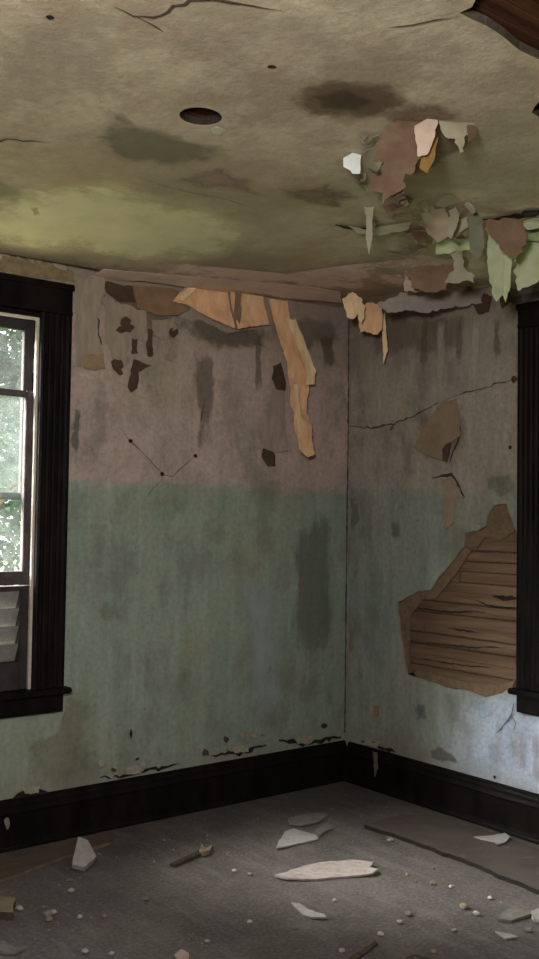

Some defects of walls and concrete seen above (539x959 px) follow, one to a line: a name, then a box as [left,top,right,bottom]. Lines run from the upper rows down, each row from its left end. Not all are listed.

crack [115,0,282,32]
crack [0,136,51,144]
water stain [108,118,210,161]
water stain [304,82,466,173]
peeling [487,218,539,304]
peeling [101,316,142,370]
peeling [269,298,316,457]
crack [344,318,511,733]
flaking render [398,504,517,697]
flaking render [98,747,180,779]
flaking render [202,731,267,757]
flaking render [279,723,341,747]